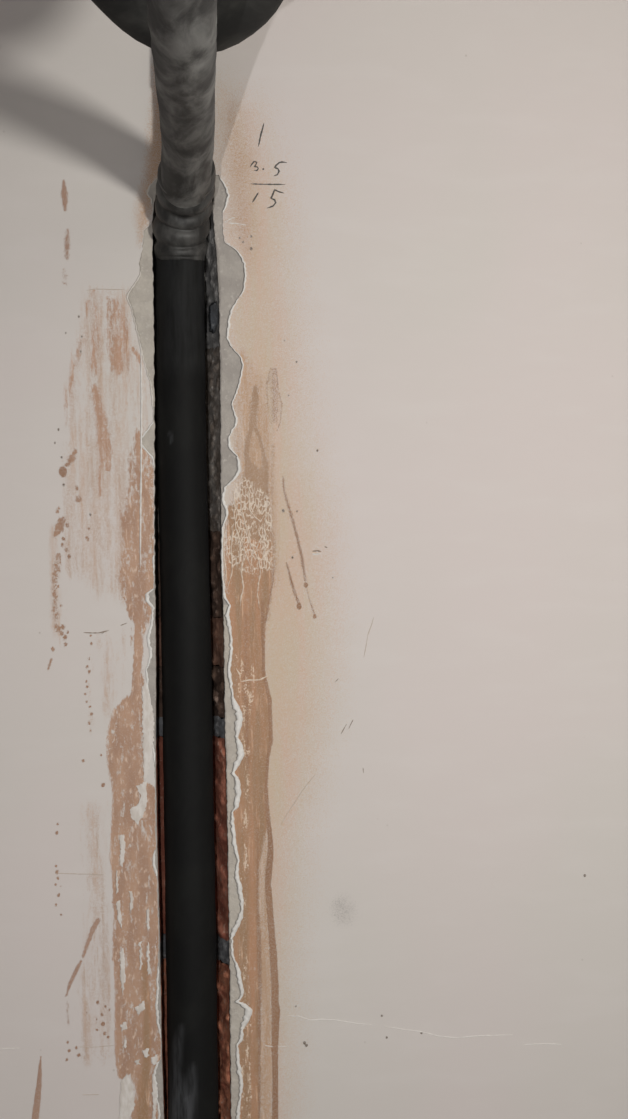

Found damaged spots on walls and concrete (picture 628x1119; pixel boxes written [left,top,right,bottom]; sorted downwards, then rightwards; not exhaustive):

corrosion [48,506,71,670]
corrosion [59,448,77,478]
spalling [126,178,158,471]
peeling [212,177,252,1119]
water stain [213,62,362,1119]
corrosion [65,918,101,1023]